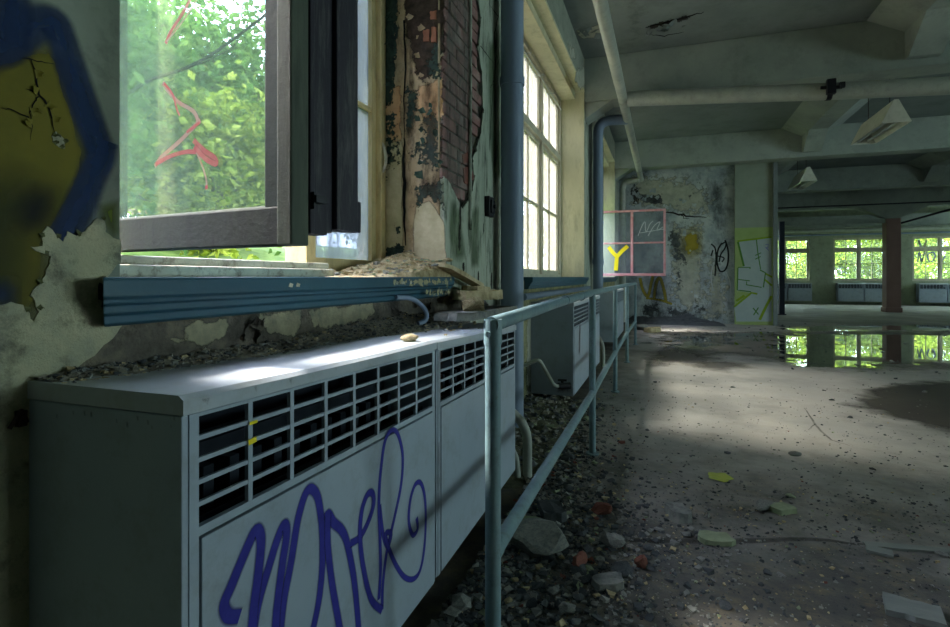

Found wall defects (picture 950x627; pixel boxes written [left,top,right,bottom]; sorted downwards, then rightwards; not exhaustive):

crack [3,57,55,140]
spalling [385,0,485,210]
spalling [646,12,703,37]
peeling [0,216,464,627]